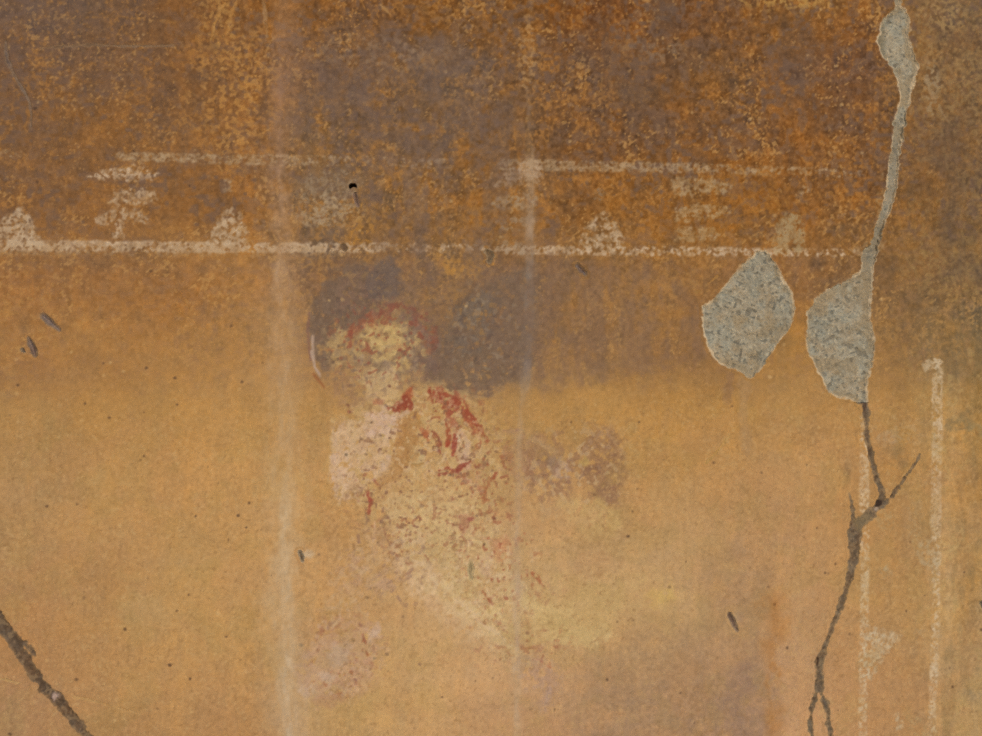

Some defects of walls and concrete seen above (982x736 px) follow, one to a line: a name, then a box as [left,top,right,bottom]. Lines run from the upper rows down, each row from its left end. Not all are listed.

spalling [874,7,921,82]
crack [855,82,918,270]
spalling [699,246,878,403]
crack [804,403,924,736]
crack [0,606,99,736]